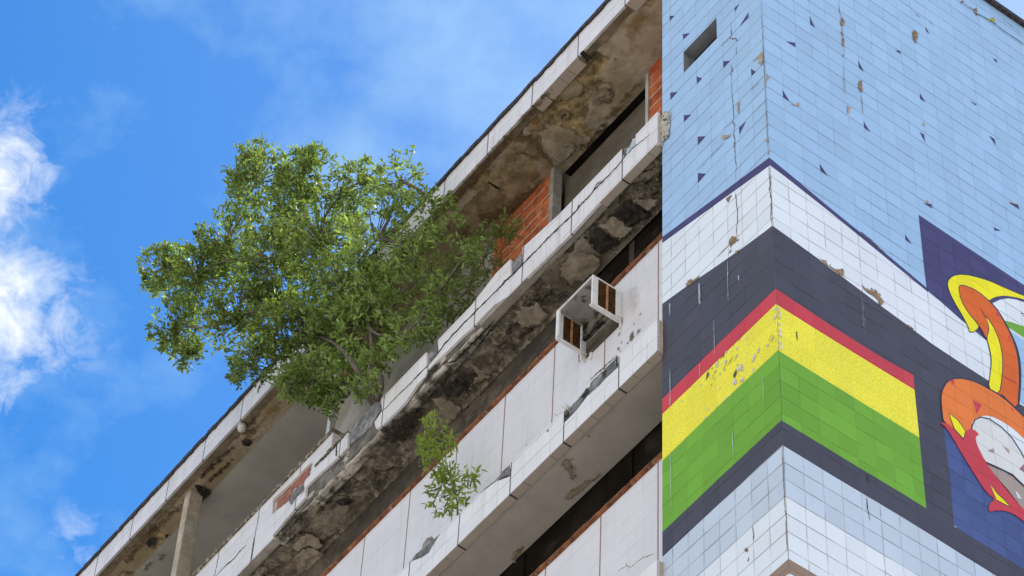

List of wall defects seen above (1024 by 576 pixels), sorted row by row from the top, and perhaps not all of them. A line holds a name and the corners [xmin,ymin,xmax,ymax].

leakage [452,93,559,204]
spalling [660,111,671,142]
leakage [478,183,537,224]
peeling [862,284,884,305]
leakage [378,364,454,446]
peeling [565,356,618,421]
peeling [700,307,783,419]
flaking render [272,463,311,513]
leakage [277,482,349,540]
peeling [408,534,440,563]